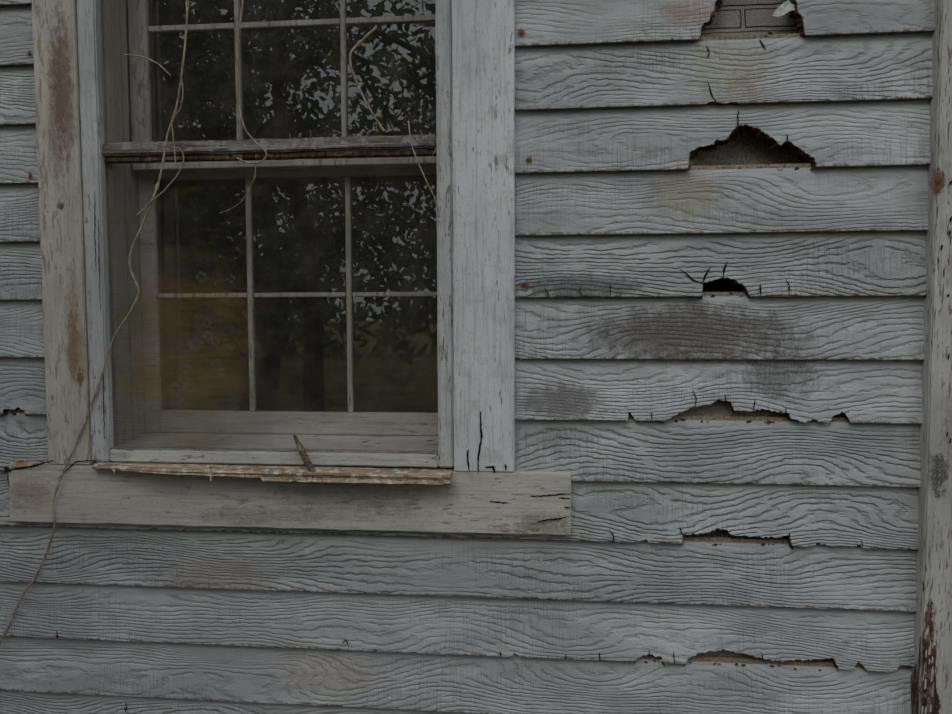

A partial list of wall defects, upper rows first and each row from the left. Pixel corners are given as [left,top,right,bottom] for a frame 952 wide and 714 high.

peeling [772,0,796,17]
crack [467,412,507,473]
peeling [911,594,942,714]